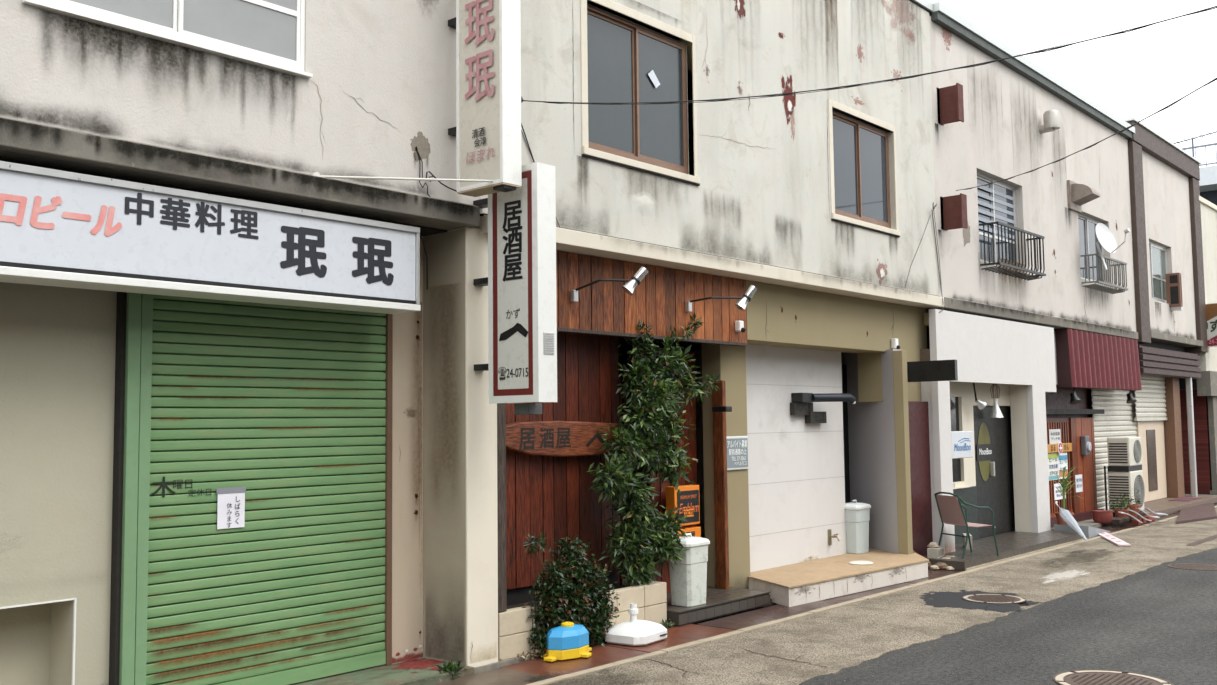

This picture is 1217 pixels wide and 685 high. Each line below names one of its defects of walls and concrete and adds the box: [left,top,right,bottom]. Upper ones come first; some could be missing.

peeling [734,0,745,20]
leakage [49,14,204,71]
leakage [222,57,293,87]
crack [309,78,395,146]
peeling [781,75,796,124]
peeling [876,259,888,285]
rust [150,608,355,682]